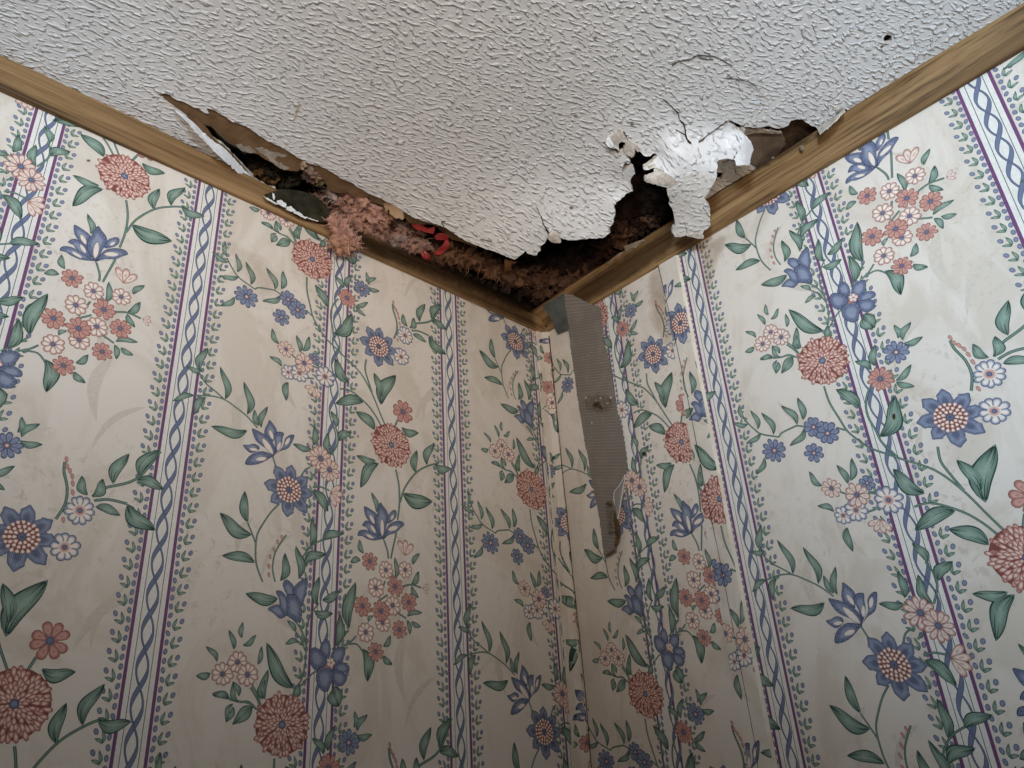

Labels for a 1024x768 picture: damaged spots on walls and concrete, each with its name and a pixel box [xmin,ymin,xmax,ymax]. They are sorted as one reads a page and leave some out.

crack [663,99,727,144]
peeling [609,75,754,239]
flaking render [263,193,318,222]
flaking render [547,232,561,243]